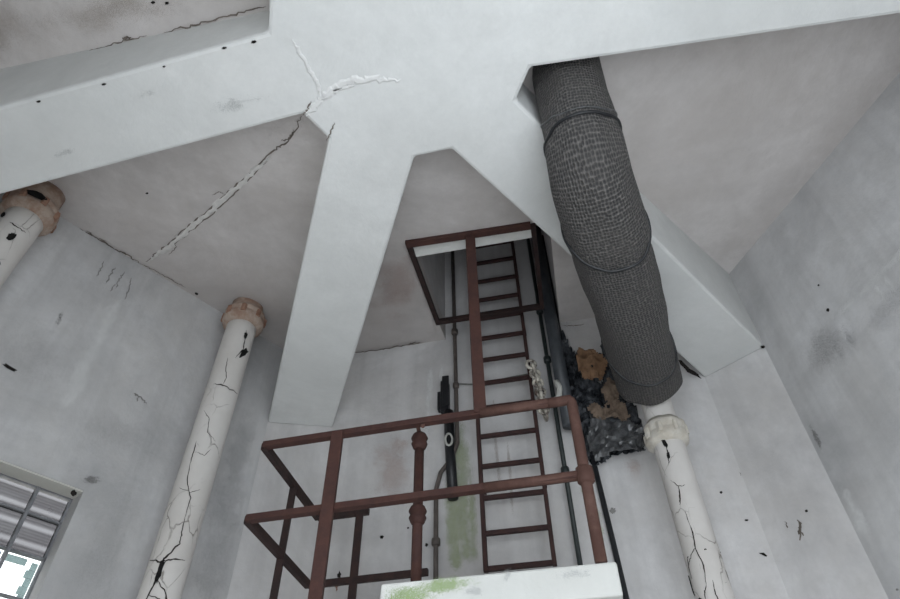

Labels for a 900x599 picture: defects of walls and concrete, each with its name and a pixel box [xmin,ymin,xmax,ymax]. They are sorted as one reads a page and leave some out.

crack [80,6,266,53]
crack [216,340,245,394]
crack [146,414,215,599]
leakage [385,471,482,599]
crack [674,482,721,599]